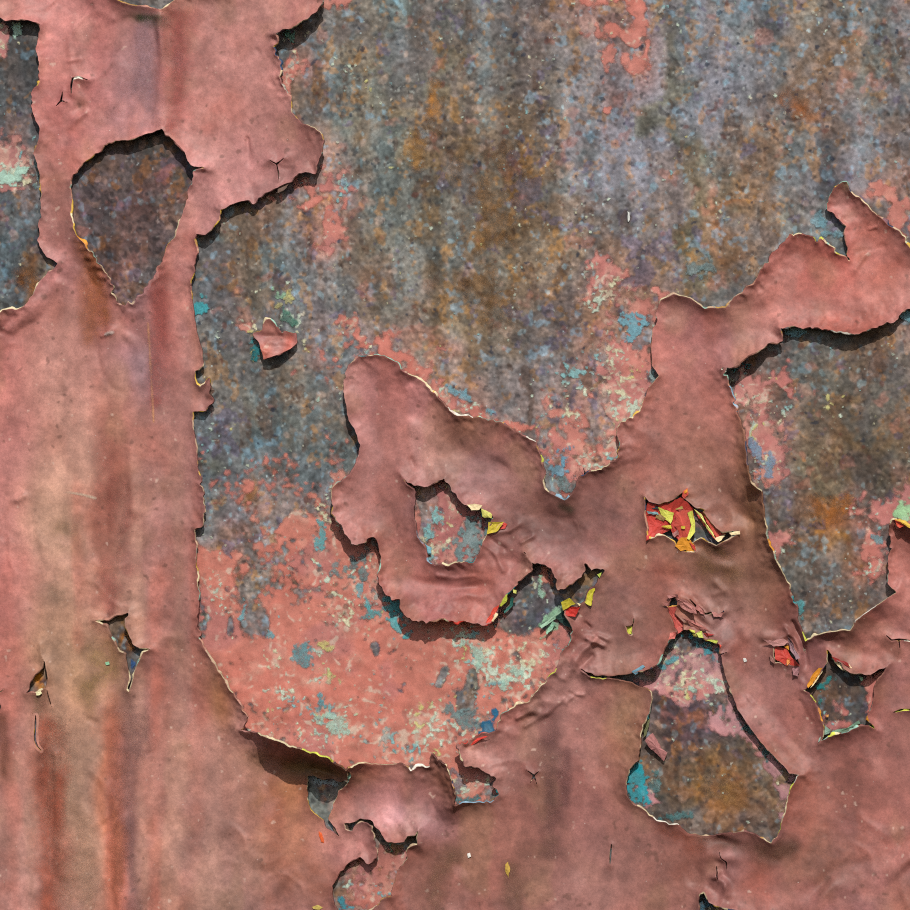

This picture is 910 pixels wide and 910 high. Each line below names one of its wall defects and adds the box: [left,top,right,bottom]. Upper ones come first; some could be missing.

peeling [0,18,57,312]
peeling [69,129,204,306]
peeling [190,0,910,910]
peeling [95,613,150,692]